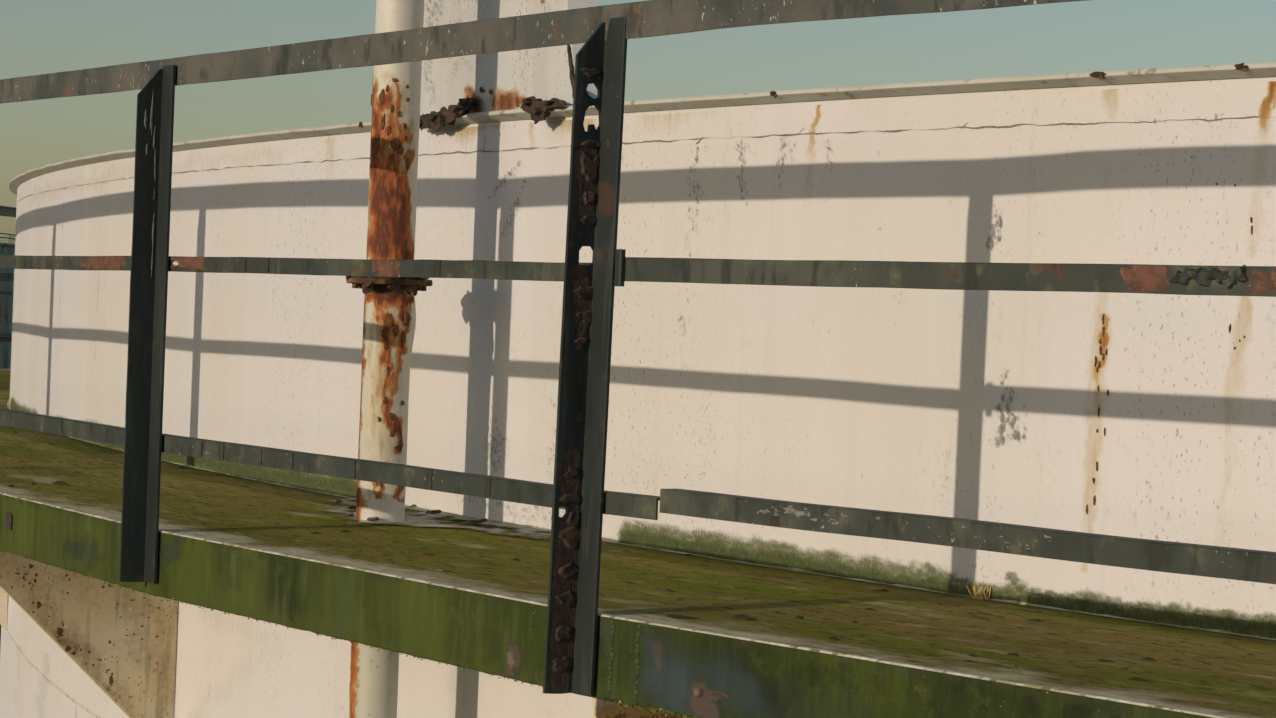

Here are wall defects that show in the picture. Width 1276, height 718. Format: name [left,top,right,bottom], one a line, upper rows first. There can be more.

rust [1259,81,1276,128]
crack [175,157,370,173]
crack [418,139,560,156]
rust [574,140,601,226]
crack [622,116,1270,144]
rust [346,78,570,459]
peeling [1119,265,1276,293]
rust [1093,313,1109,436]
rust [356,480,404,521]
rust [548,448,582,693]
rust [349,642,359,718]
rust [594,682,729,718]